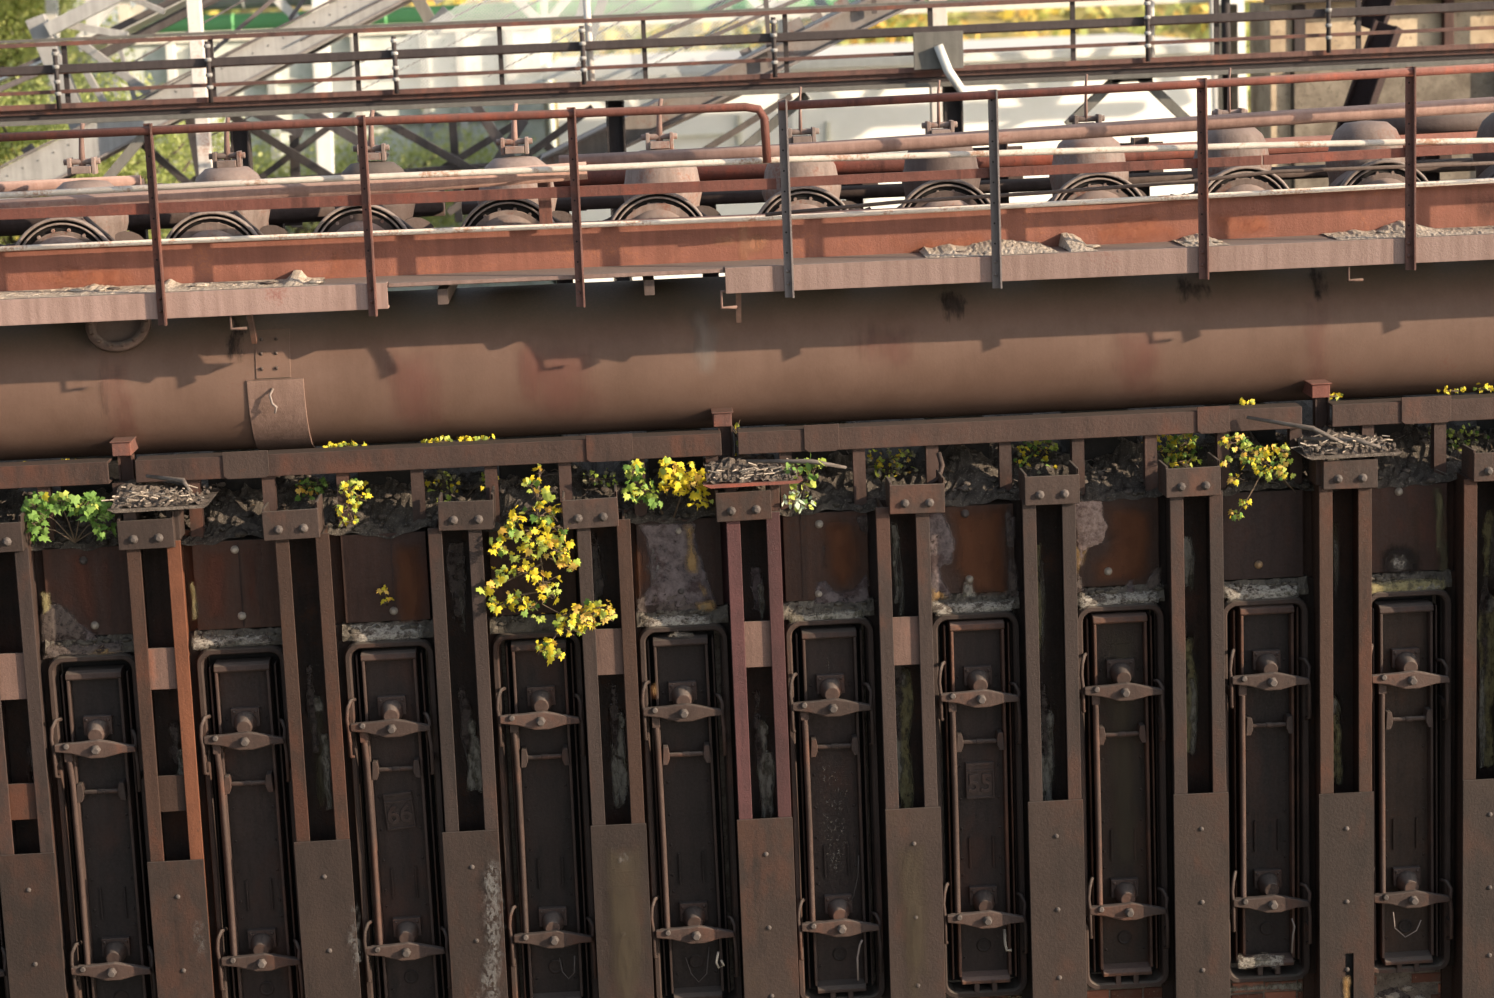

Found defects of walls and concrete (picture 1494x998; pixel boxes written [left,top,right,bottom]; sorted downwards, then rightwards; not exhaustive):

peeling [638,523,718,626]
peeling [929,513,975,600]
peeling [986,512,1019,611]
spalling [1075,499,1108,600]
water stain [1479,510,1493,768]